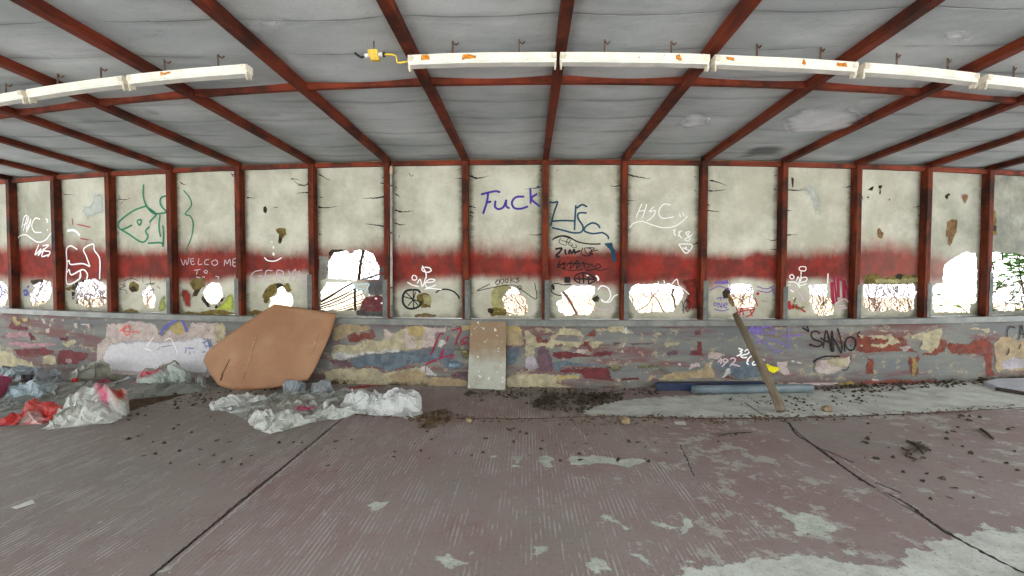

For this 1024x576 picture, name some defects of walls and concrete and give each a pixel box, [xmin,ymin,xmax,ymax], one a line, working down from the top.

peeling [0,317,226,378]
peeling [324,267,470,386]
peeling [487,284,1024,418]
peeling [567,454,646,468]
crack [686,403,1024,573]
peeling [650,516,705,535]
peeling [774,507,840,539]
peeling [628,522,1024,576]